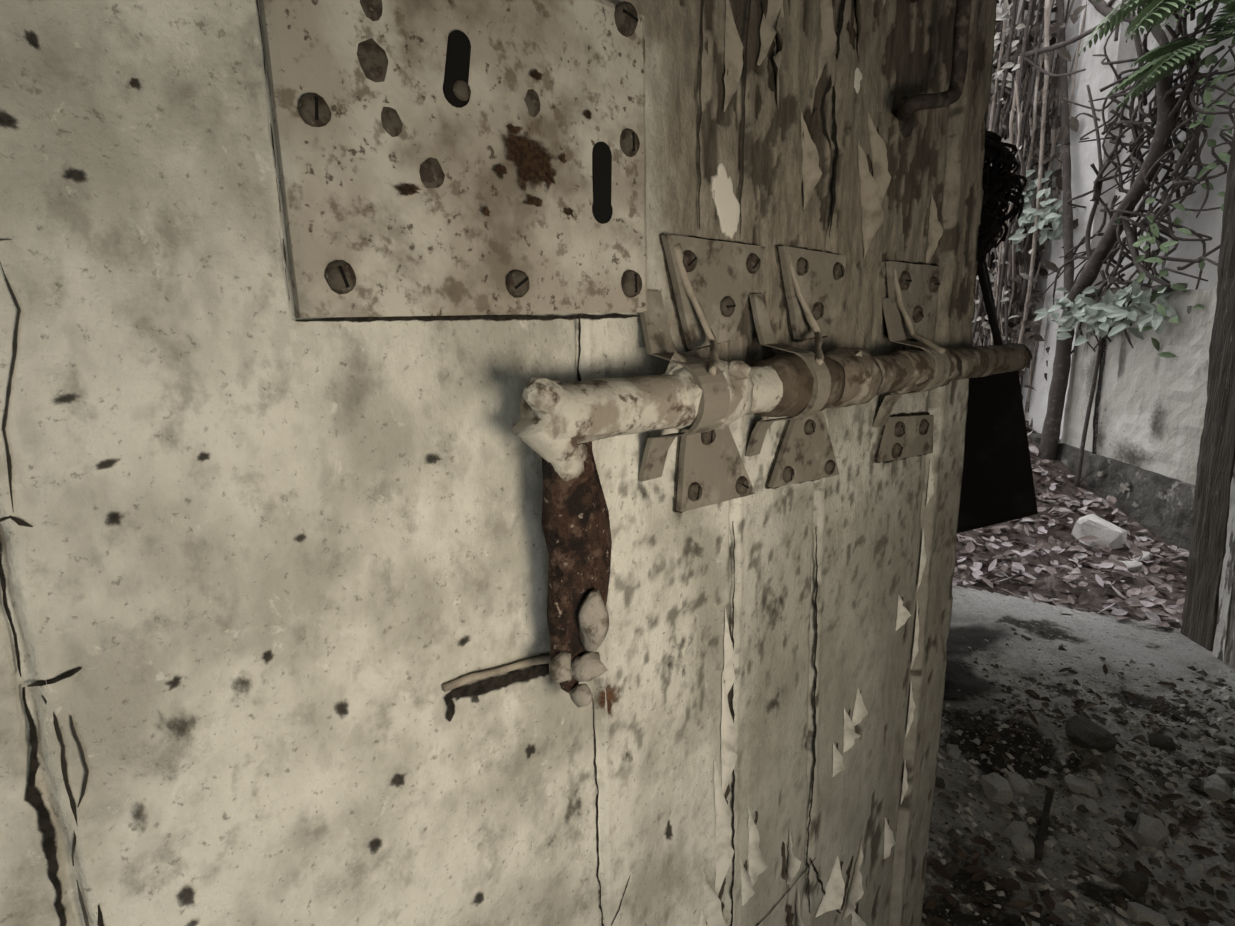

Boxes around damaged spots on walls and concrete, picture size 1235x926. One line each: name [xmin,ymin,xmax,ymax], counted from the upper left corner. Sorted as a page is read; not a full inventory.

peeling [705,0,791,119]
peeling [815,0,863,94]
corrosion [395,184,420,196]
corrosion [493,124,566,207]
spalling [711,163,740,239]
peeling [800,107,822,209]
peeling [857,112,891,258]
peeling [926,194,943,263]
crack [0,239,104,926]
peeling [895,529,926,737]
peeling [698,608,868,926]
peeling [884,818,896,859]